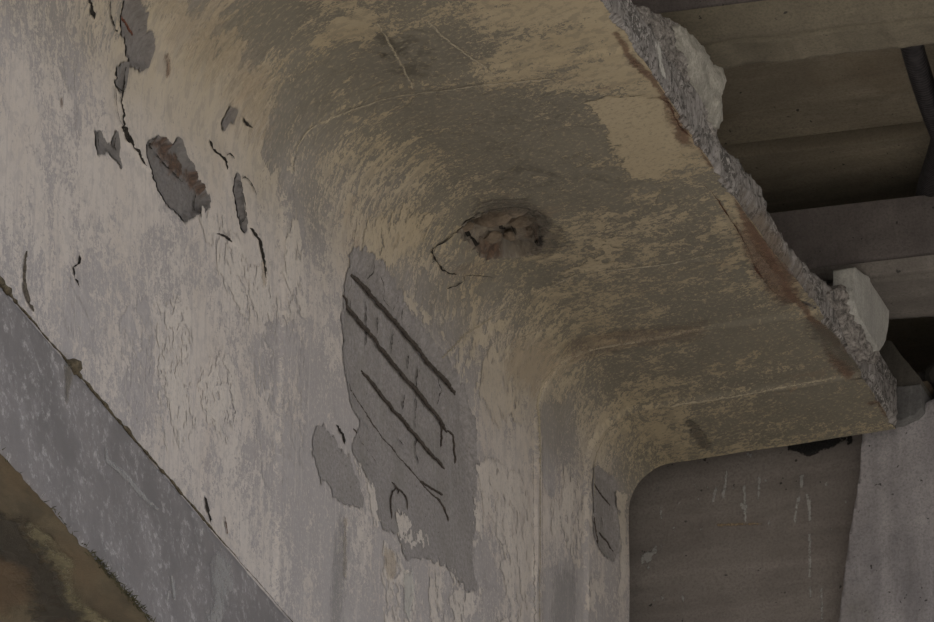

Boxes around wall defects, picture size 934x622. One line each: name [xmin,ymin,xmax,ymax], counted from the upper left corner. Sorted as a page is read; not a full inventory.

crack [89,0,118,32]
spalling [95,130,123,169]
crack [116,68,147,166]
spalling [115,0,156,92]
peeling [584,95,704,180]
corrosion [614,32,713,167]
spalling [635,5,727,144]
spalling [146,135,307,333]
crack [217,228,267,277]
spalling [824,267,889,364]
spalling [312,203,549,622]
spalling [550,465,628,620]